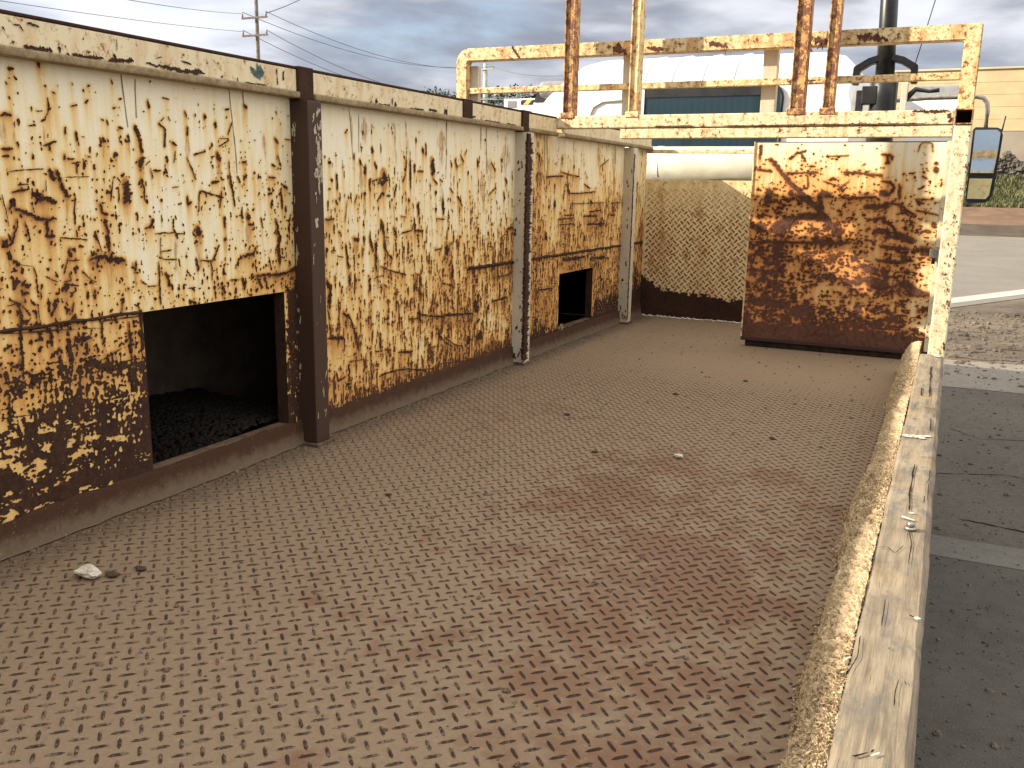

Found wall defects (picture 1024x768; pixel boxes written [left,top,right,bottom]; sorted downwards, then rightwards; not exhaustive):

rust [146,62,205,76]
rust [856,32,889,53]
rust [462,98,473,119]
rust [725,109,953,127]
rust [90,252,126,264]
peeling [0,66,300,524]
rust [256,220,296,277]
rust [421,293,491,364]
peeling [324,124,647,409]
rust [467,110,604,363]
rust [627,154,743,322]
rust [756,158,931,316]